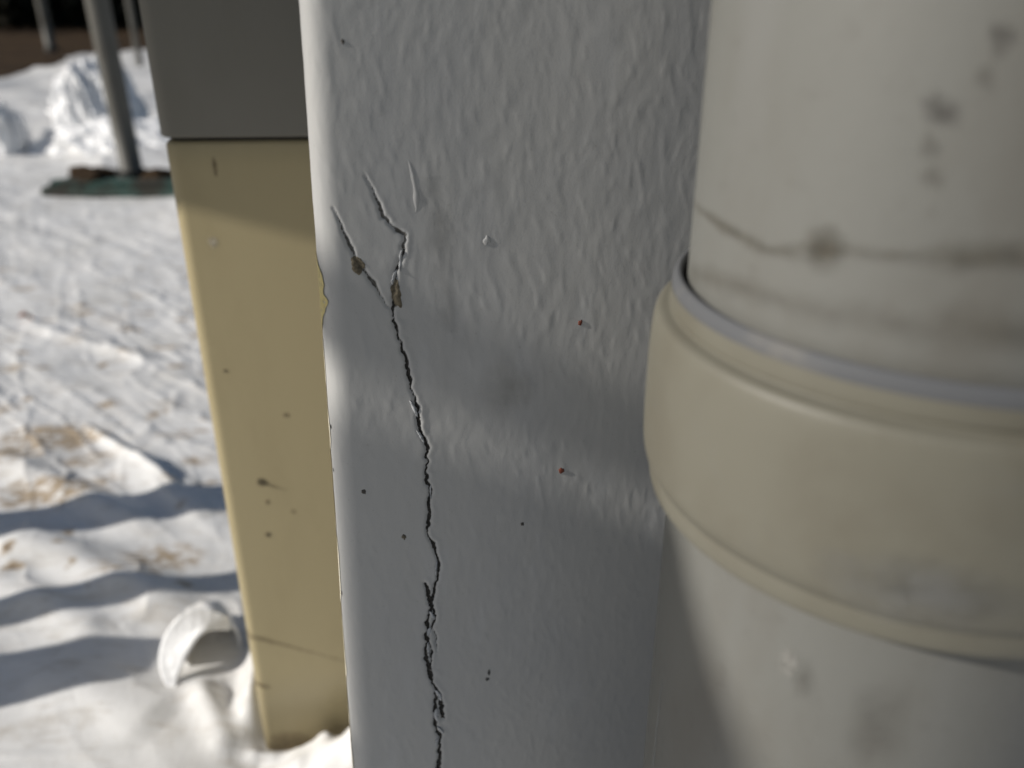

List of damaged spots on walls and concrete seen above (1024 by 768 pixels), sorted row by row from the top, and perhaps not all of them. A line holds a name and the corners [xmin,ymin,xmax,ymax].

crack [337,188,444,768]